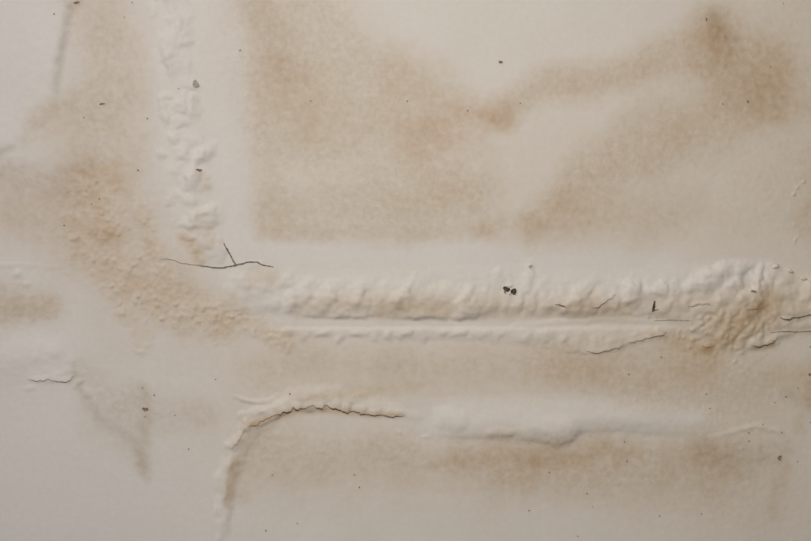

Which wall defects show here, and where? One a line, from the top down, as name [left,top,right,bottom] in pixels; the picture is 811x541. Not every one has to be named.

leakage [204,0,811,257]
crack [169,244,273,268]
leakage [239,411,800,527]